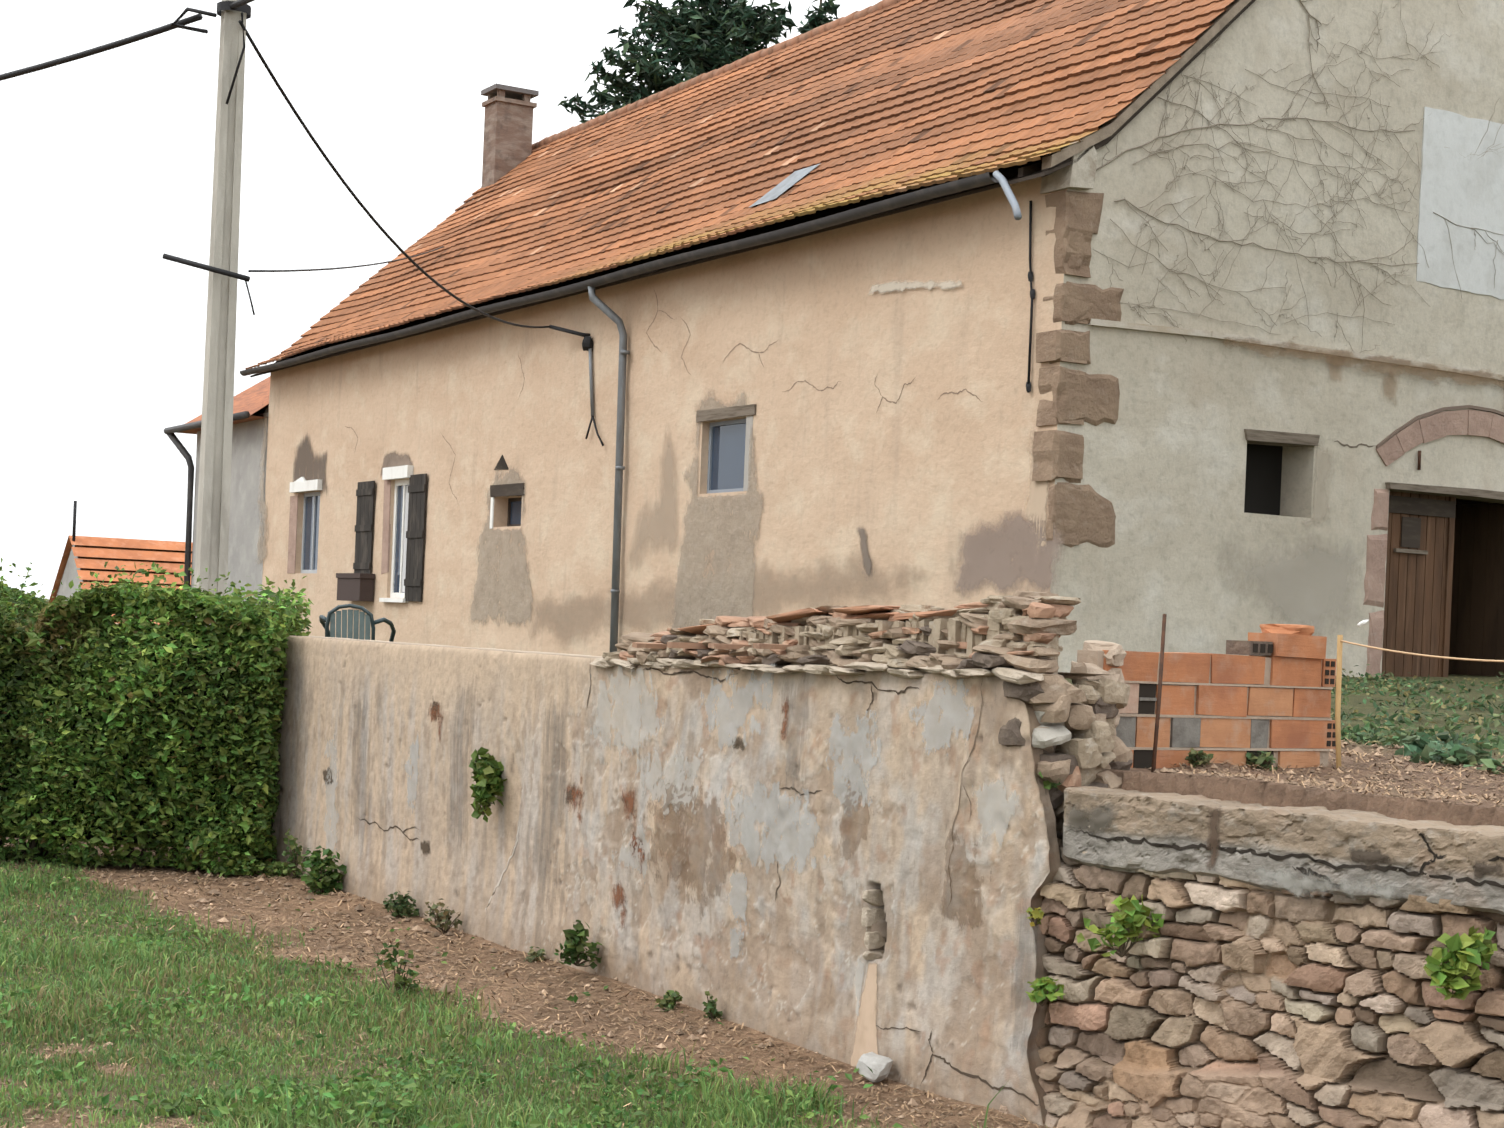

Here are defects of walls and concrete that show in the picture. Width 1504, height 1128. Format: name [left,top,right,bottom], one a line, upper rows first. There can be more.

crack [646,288,839,392]
crack [875,376,982,413]
rust [428,704,442,739]
crack [357,817,418,841]
crack [947,680,983,908]
spalling [861,889,886,960]
crack [876,1025,1041,1106]